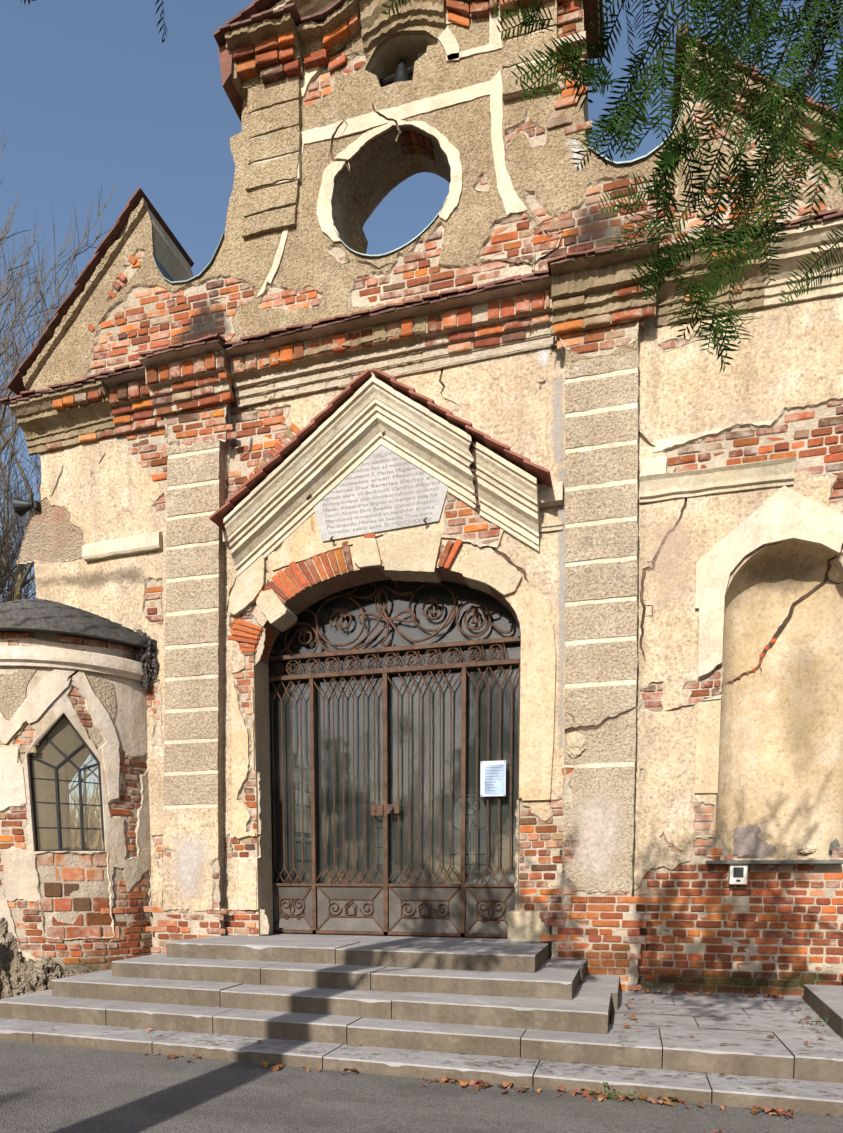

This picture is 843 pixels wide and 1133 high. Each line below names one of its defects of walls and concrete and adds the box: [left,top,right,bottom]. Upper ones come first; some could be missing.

spalling [349,93,836,307]
spalling [85,248,323,376]
crack [439,369,480,513]
crack [639,431,654,447]
spalling [662,398,843,504]
spalling [16,497,86,565]
crack [491,547,529,582]
crack [639,498,687,660]
crack [665,543,843,711]
spalling [0,611,269,972]
crack [564,706,637,734]
spalling [514,767,843,995]